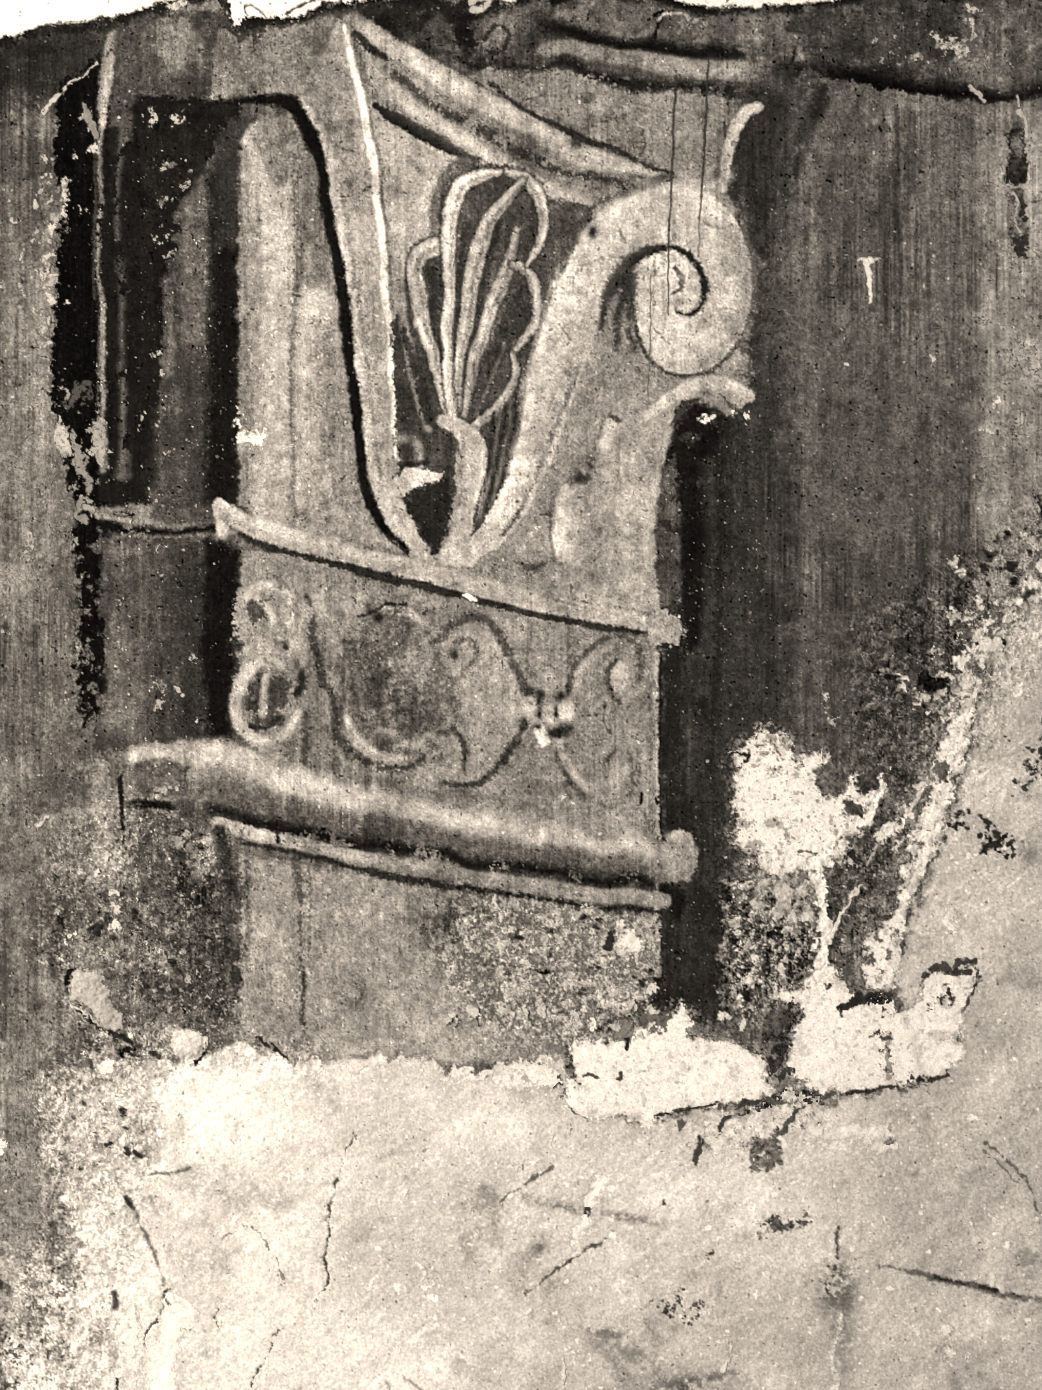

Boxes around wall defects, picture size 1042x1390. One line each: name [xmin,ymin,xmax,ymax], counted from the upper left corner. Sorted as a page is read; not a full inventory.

peeling [230,0,247,26]
peeling [468,0,493,13]
peeling [41,61,98,115]
peeling [73,103,102,159]
peeling [142,107,185,127]
peeling [157,161,193,208]
peeling [0,154,113,561]
peeling [233,406,267,451]
peeling [699,410,750,424]
flaking render [40,492,1042,1390]
crack [316,1132,354,1300]
crack [251,1329,280,1390]